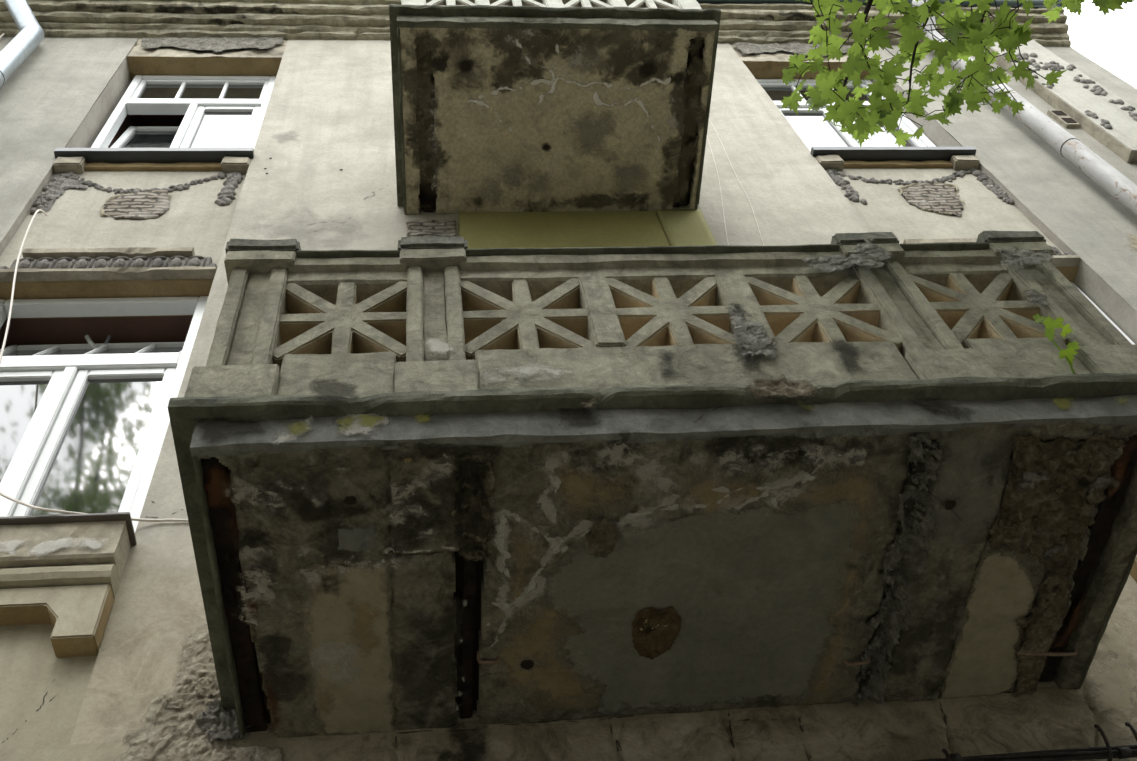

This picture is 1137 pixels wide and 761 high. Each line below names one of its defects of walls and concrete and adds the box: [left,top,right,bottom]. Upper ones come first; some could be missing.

leakage [401,16,709,212]
leakage [559,434,676,492]
leakage [677,435,891,483]
leakage [232,442,499,591]
leakage [237,530,276,625]
rust [631,606,682,660]
leakage [882,593,961,692]
peeling [941,552,1072,699]
spalling [115,624,283,761]